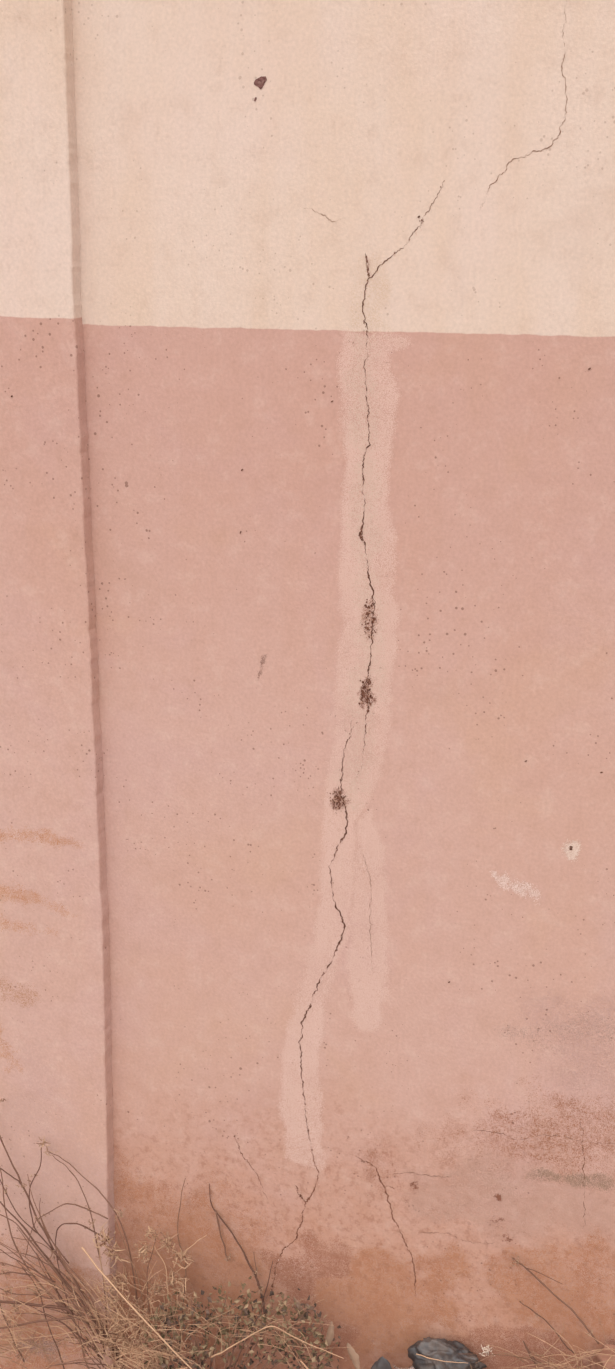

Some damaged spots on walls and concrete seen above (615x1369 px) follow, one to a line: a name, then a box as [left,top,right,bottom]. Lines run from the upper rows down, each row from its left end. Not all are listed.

crack [487,12,567,193]
crack [235,180,445,1307]
crack [359,1158,493,1294]